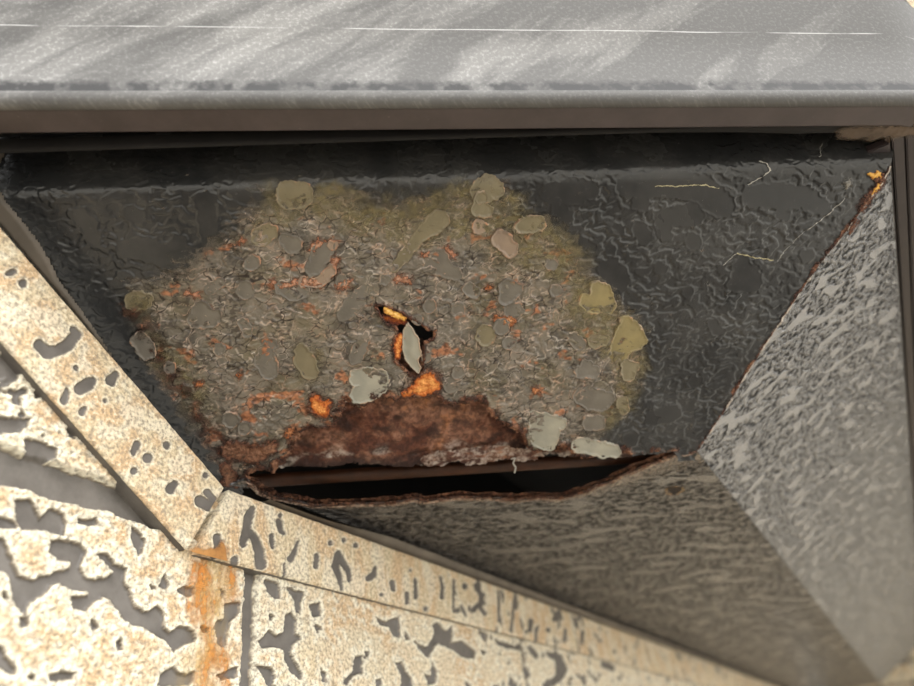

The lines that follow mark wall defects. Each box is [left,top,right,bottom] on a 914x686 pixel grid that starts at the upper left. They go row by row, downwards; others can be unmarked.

peeling [124,173,648,489]
rust [382,306,409,360]
rust [305,392,335,421]
rust [398,366,444,399]
rust [187,541,236,686]